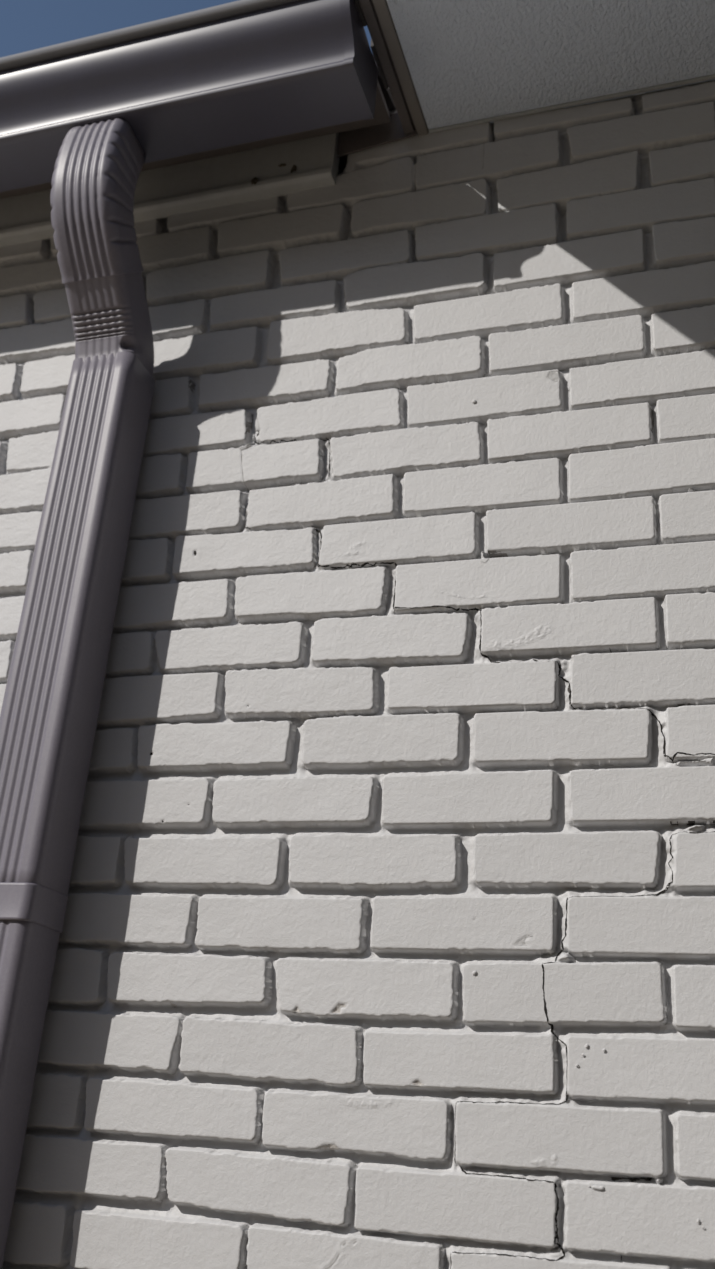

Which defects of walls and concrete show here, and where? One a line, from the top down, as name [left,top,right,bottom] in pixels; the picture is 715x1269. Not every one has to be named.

crack [241,437,330,530]
crack [314,528,715,761]
crack [455,831,715,1122]
crack [450,1158,565,1269]